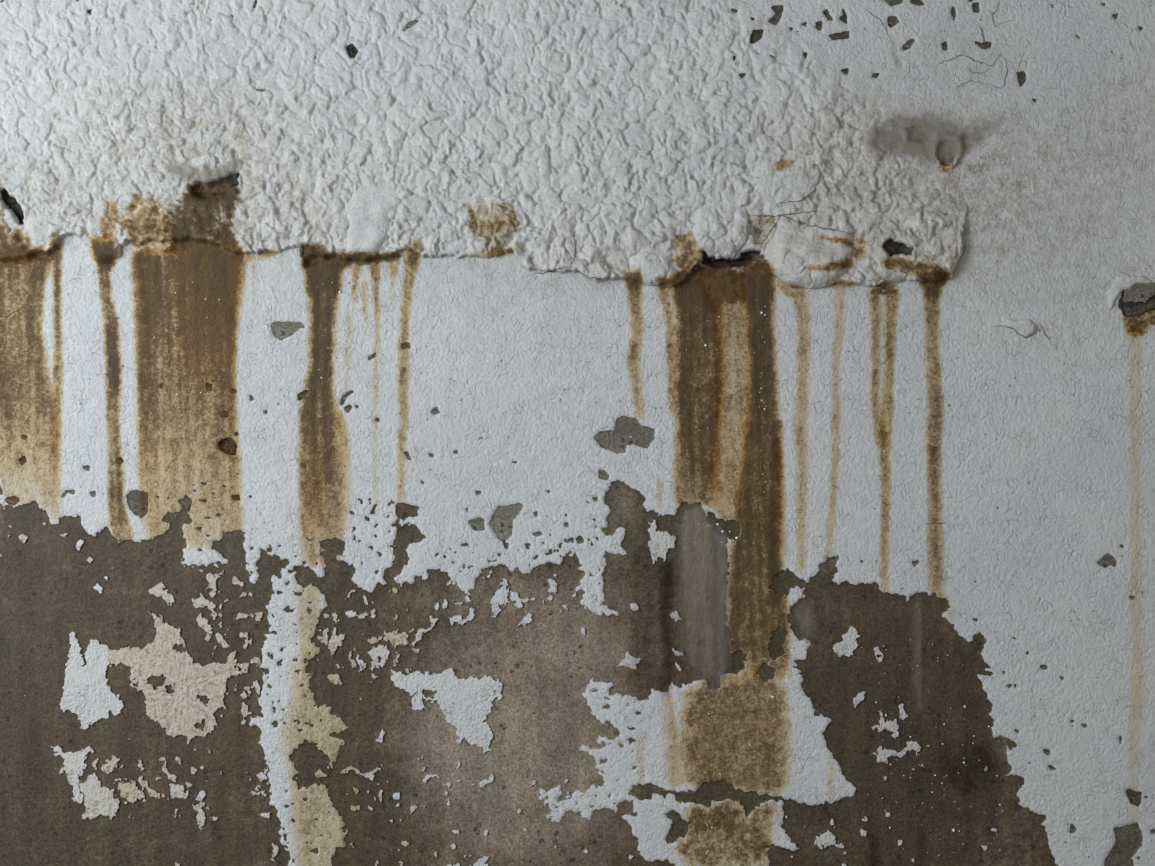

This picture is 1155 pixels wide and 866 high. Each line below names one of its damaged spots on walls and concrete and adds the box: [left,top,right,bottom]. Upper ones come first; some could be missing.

peeling [750,5,849,44]
crack [940,3,1008,89]
crack [746,162,851,246]
rust [0,226,61,465]
rust [91,182,243,543]
rust [299,243,418,558]
peeling [0,469,1058,866]
peeling [594,416,655,459]
damp [663,503,727,680]
rust [658,217,788,790]
rust [884,258,951,585]
peeling [1104,823,1155,866]